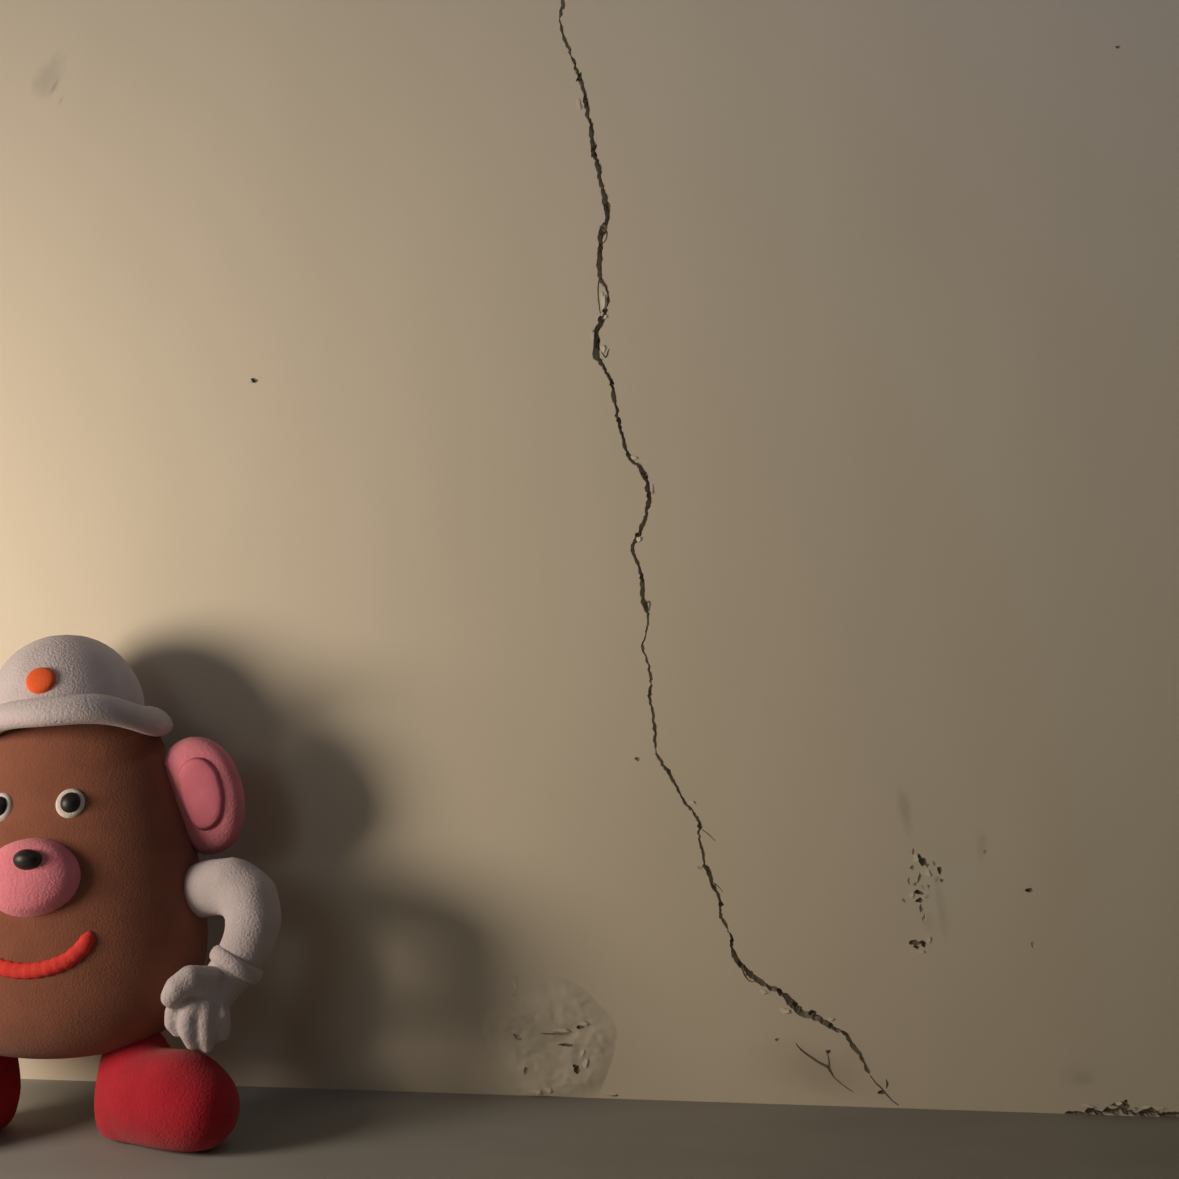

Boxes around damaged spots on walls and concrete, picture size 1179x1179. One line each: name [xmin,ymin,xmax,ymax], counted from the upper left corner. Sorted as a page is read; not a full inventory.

crack [559,0,899,1106]
peeling [482,976,618,1097]
spalling [1066,1100,1179,1117]